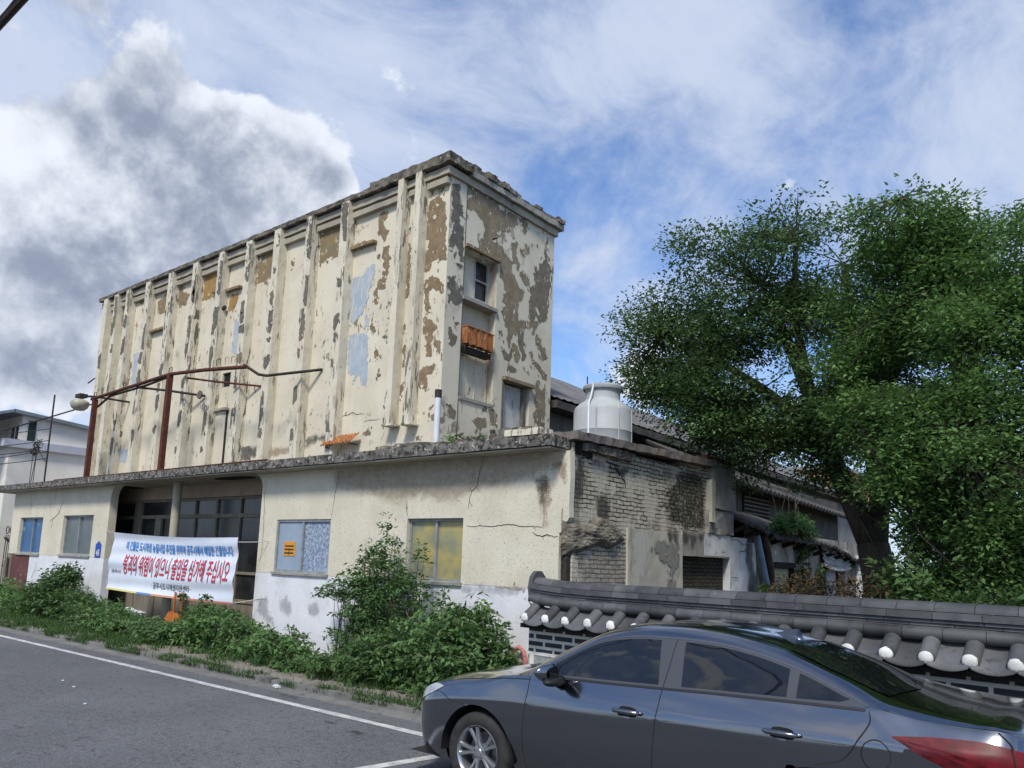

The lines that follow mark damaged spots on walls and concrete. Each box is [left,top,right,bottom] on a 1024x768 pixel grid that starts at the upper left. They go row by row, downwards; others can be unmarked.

peeling [97,260,245,397]
peeling [245,233,280,369]
peeling [291,202,391,387]
peeling [418,183,552,427]
peeling [241,391,264,461]
peeling [471,404,498,435]
crack [468,457,558,537]
peeling [651,529,680,588]